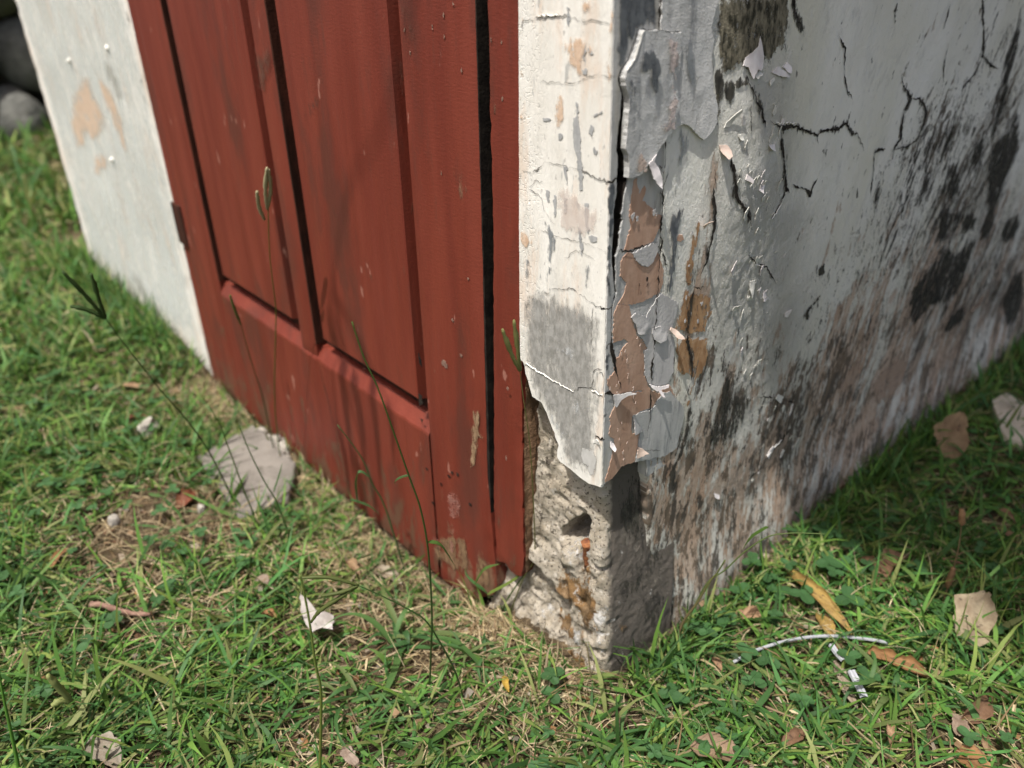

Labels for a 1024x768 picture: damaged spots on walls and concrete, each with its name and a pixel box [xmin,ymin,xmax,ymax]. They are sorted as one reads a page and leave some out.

leakage [715,0,789,118]
crack [791,0,803,33]
crack [943,0,999,90]
crack [519,0,669,452]
peeling [719,145,733,159]
crack [686,38,928,379]
leakage [804,13,1024,355]
leakage [525,293,610,466]
peeling [593,154,714,486]
leakage [670,359,775,482]
rust [559,577,594,646]
spalling [581,538,590,569]